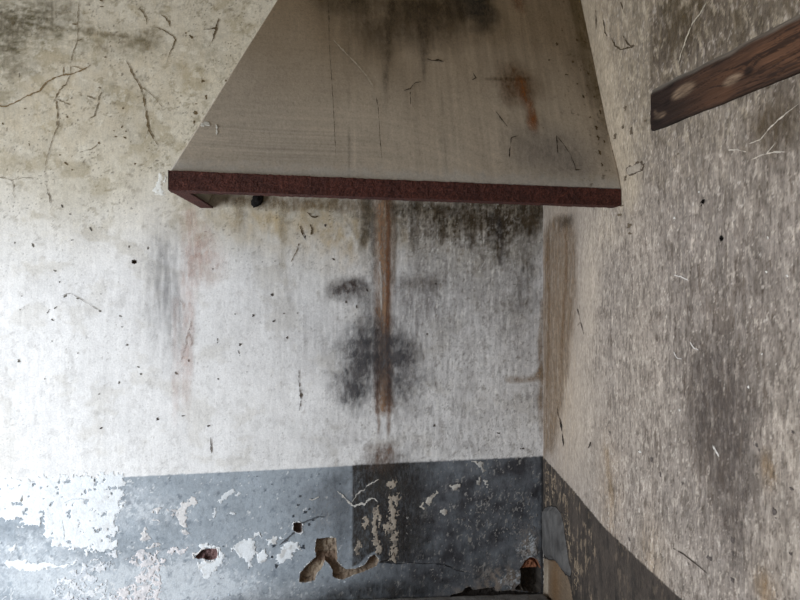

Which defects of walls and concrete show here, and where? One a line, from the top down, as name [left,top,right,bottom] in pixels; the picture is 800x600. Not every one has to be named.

crack [0,6,90,164]
crack [126,61,160,145]
crack [140,9,176,57]
leakage [262,199,374,253]
corrosion [375,200,392,432]
peeling [0,471,412,600]
spalling [450,469,580,600]